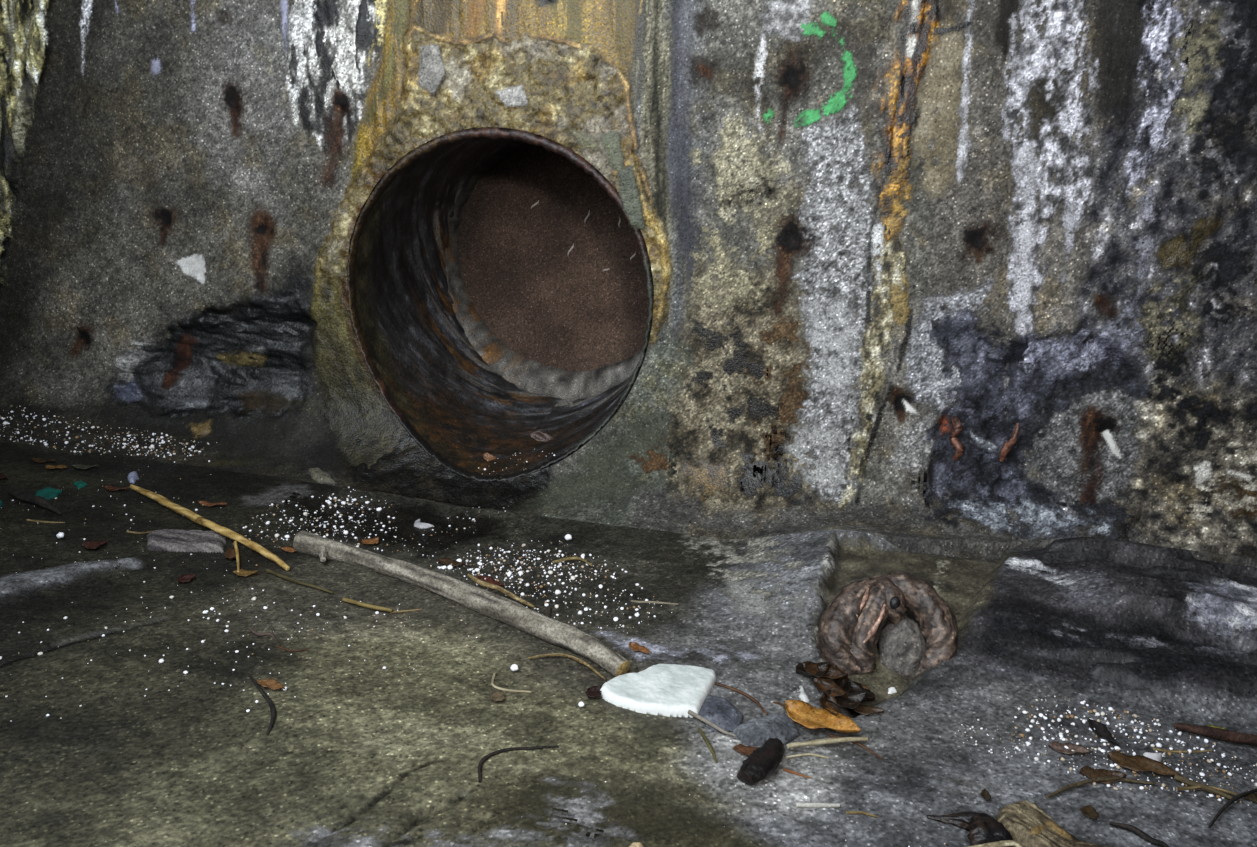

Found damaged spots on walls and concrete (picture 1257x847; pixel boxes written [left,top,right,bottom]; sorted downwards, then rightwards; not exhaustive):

spalling [105,22,673,469]
corrosion [322,0,652,185]
corrosion [347,127,654,482]
damp [629,0,817,513]
corrosion [773,214,815,315]
damp [838,23,875,129]
corrosion [887,387,914,422]
corrosion [875,0,975,245]
damp [939,0,975,182]
spalling [890,280,1152,542]
corrosion [1079,407,1121,505]
damp [995,0,1257,451]